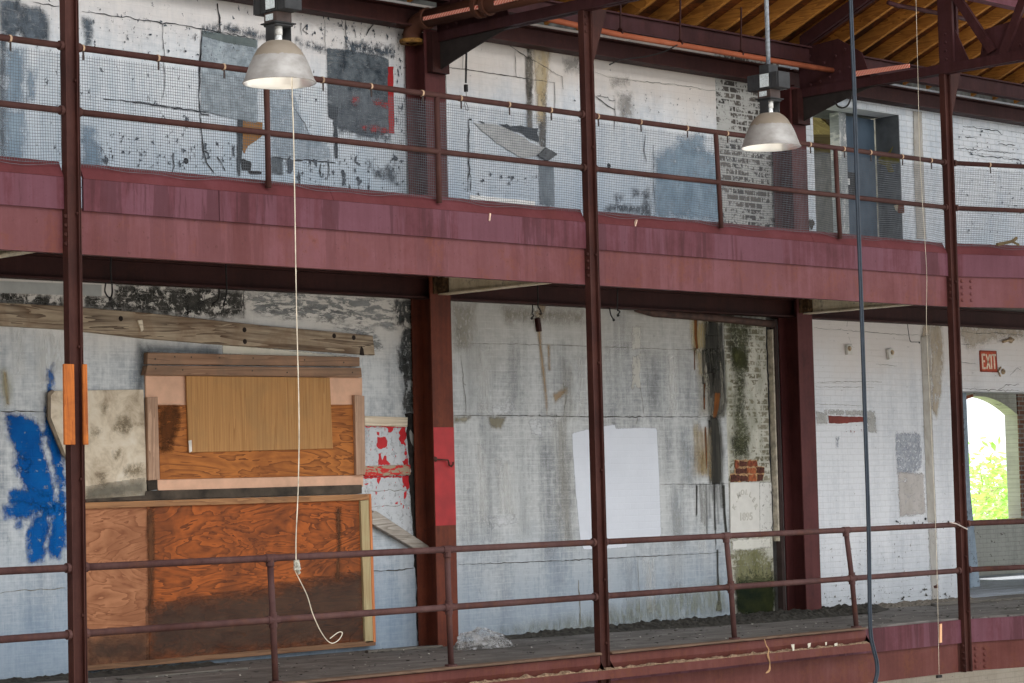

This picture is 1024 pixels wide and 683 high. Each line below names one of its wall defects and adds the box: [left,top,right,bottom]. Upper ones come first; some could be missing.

peeling [0,293,63,306]
corrosion [694,320,707,370]
spalling [85,284,416,537]
water stain [692,321,727,611]
spalling [730,459,771,550]